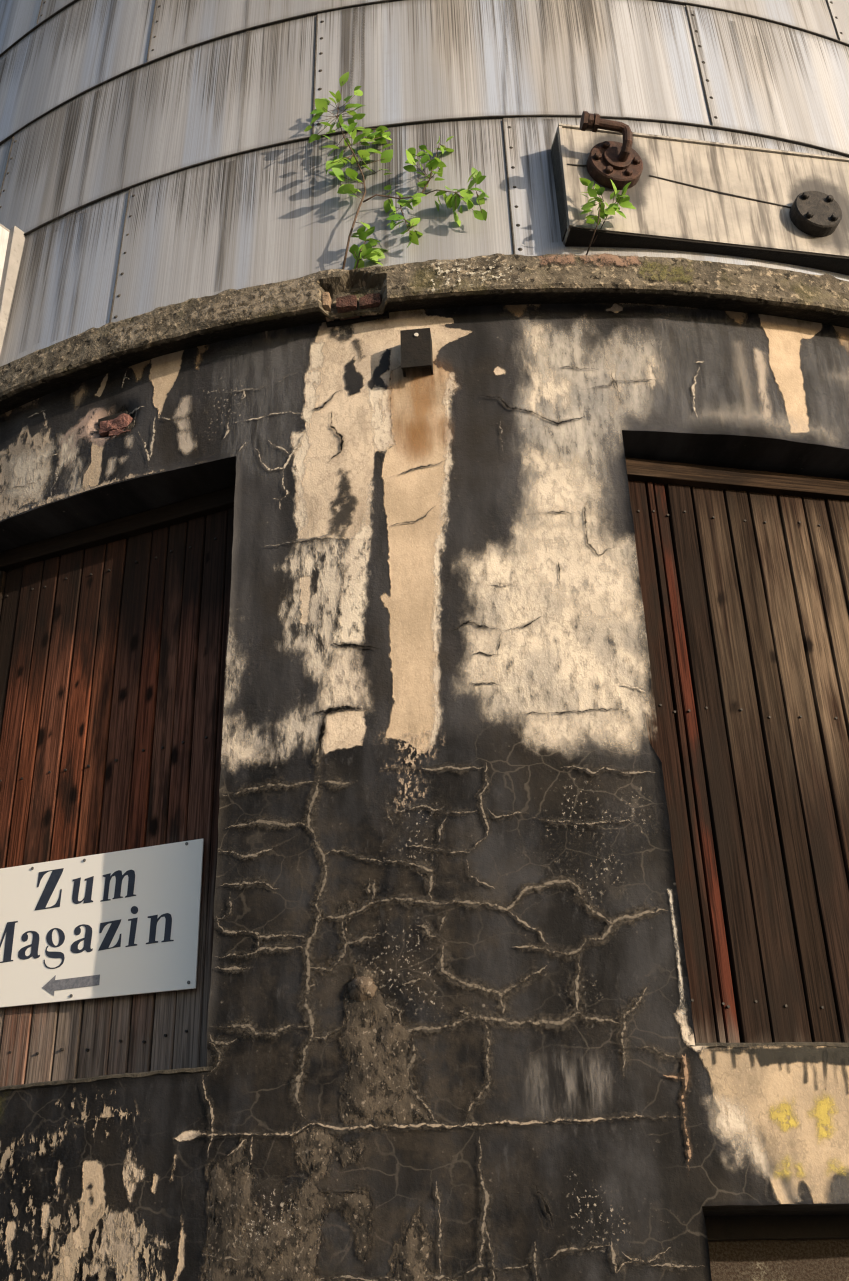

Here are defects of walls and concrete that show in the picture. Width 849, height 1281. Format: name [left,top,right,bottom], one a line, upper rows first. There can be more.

peeling [0,374,162,520]
spalling [107,319,153,347]
peeling [128,345,207,416]
crack [224,374,344,508]
peeling [191,276,472,769]
peeling [463,305,665,753]
peeling [725,311,849,433]
crack [520,684,646,714]
crack [190,706,703,1281]
peeling [0,1091,201,1281]
spalling [201,959,497,1281]
peeling [700,1046,849,1204]